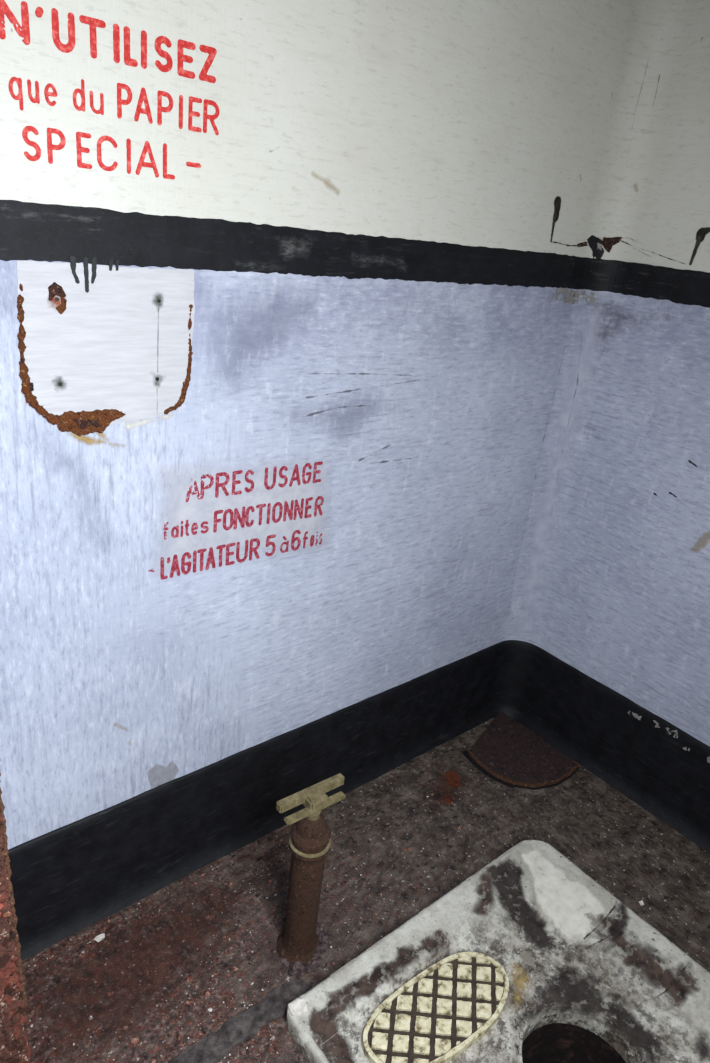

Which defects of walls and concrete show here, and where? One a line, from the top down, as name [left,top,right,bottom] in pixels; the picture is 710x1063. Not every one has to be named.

leakage [689,235,702,265]
corrosion [17,282,126,437]
peeling [17,260,195,425]
corrosion [164,304,193,414]